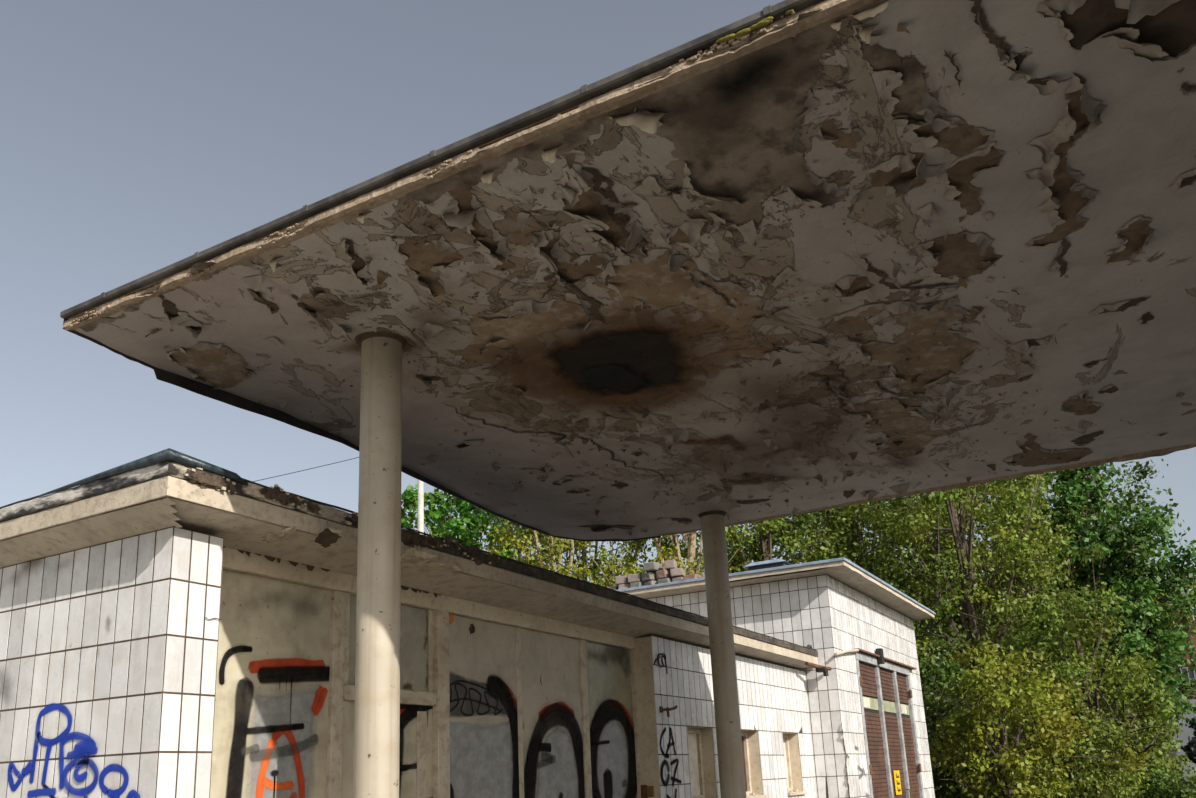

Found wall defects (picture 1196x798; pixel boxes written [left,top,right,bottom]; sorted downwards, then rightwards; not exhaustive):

peeling [1036,0,1196,62]
peeling [1104,216,1155,264]
peeling [391,9,1119,536]
peeling [69,219,315,390]
peeling [291,293,344,319]
water stain [550,330,683,396]
spalling [185,468,237,495]
spalling [258,484,358,548]
spalling [401,527,500,566]